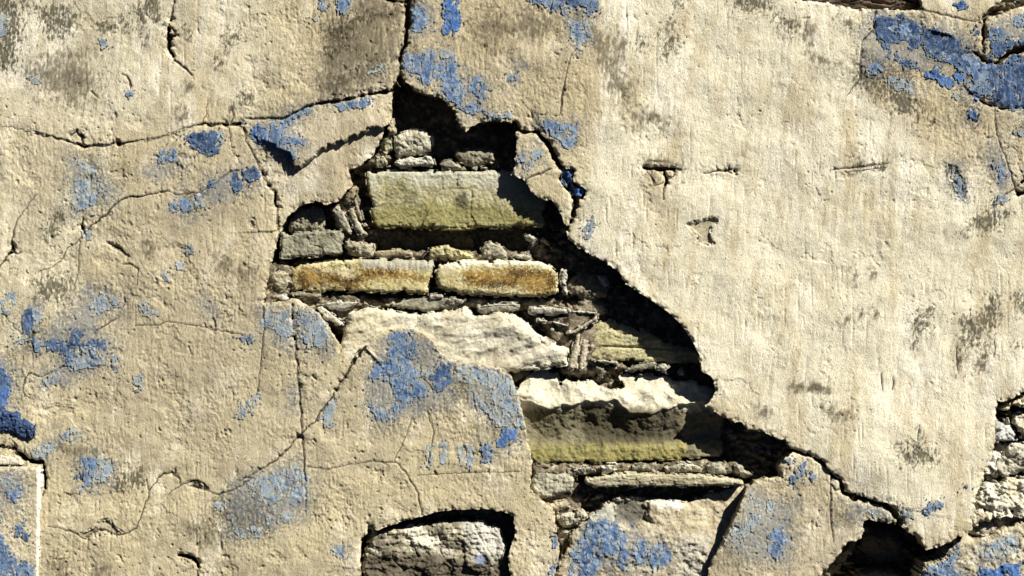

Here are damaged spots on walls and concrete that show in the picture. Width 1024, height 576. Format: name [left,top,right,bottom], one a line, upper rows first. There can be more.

crack [0,0,412,396]
flaking render [233,0,817,576]
peeling [802,0,1024,212]
crack [919,8,1024,65]
crack [964,87,1024,205]
crack [0,445,47,496]
peeling [0,273,161,576]
crack [48,304,521,540]
flaking render [821,392,1024,576]